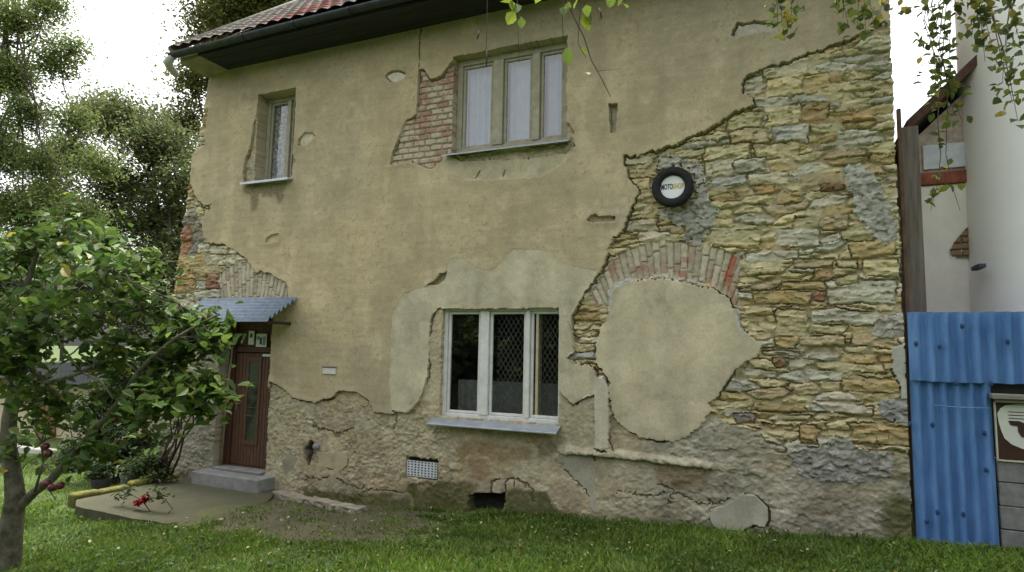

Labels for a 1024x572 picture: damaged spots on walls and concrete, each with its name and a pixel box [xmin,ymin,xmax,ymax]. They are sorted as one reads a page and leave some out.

peeling [169,182,288,324]
peeling [264,20,912,540]
flaking render [156,324,232,478]
crack [492,477,534,501]